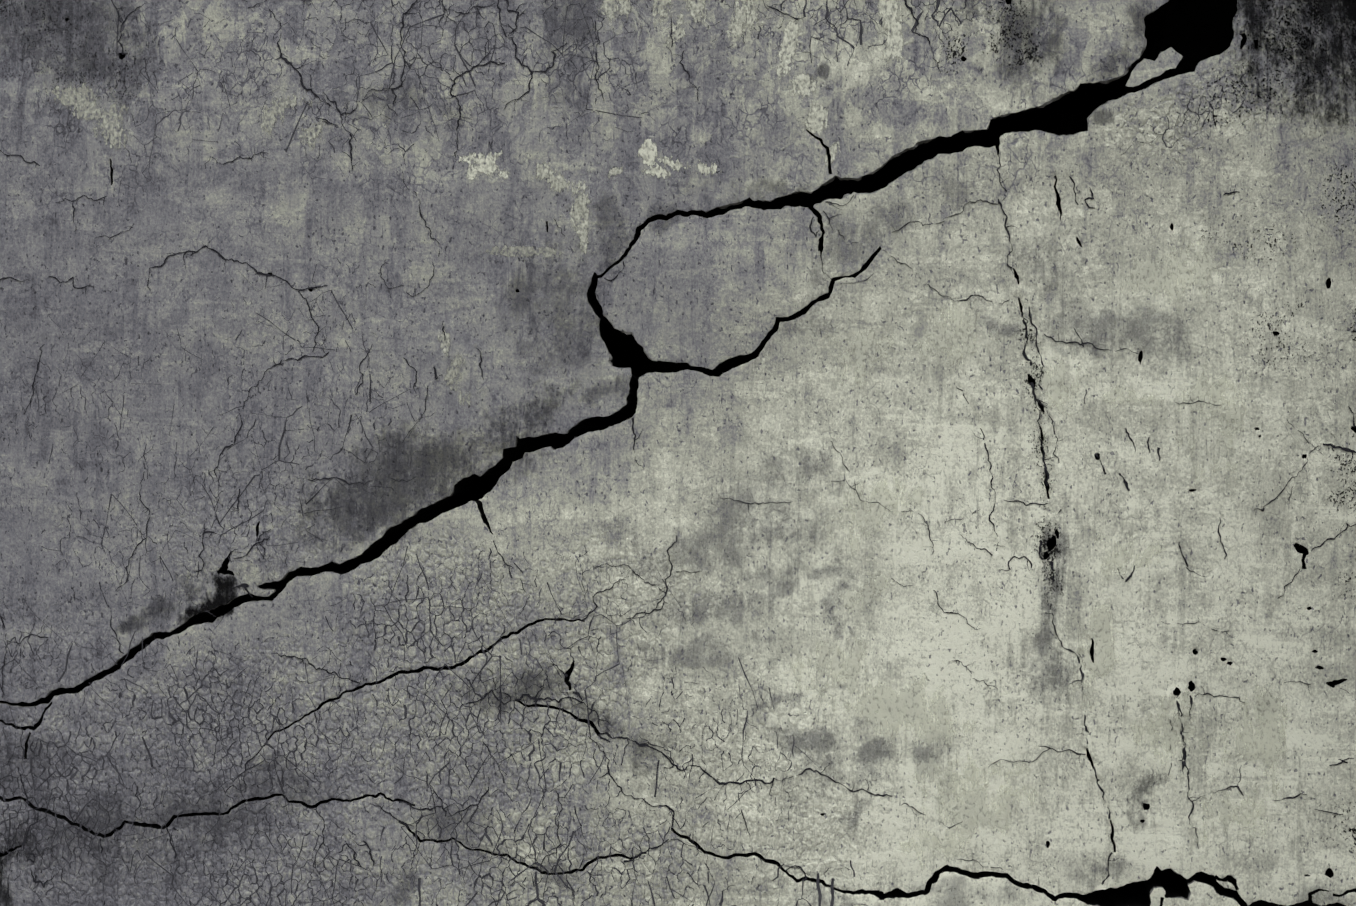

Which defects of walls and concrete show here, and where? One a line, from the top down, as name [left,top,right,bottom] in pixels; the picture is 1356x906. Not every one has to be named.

crack [692,0,888,77]
crack [902,0,983,73]
damp [1189,0,1356,128]
crack [1120,69,1257,154]
damp [1313,158,1356,234]
damp [1201,206,1298,266]
damp [1242,298,1323,369]
crack [831,441,1048,571]
crack [1254,420,1356,514]
damp [1327,432,1356,515]
crack [1178,517,1227,577]
damp [1321,802,1356,857]